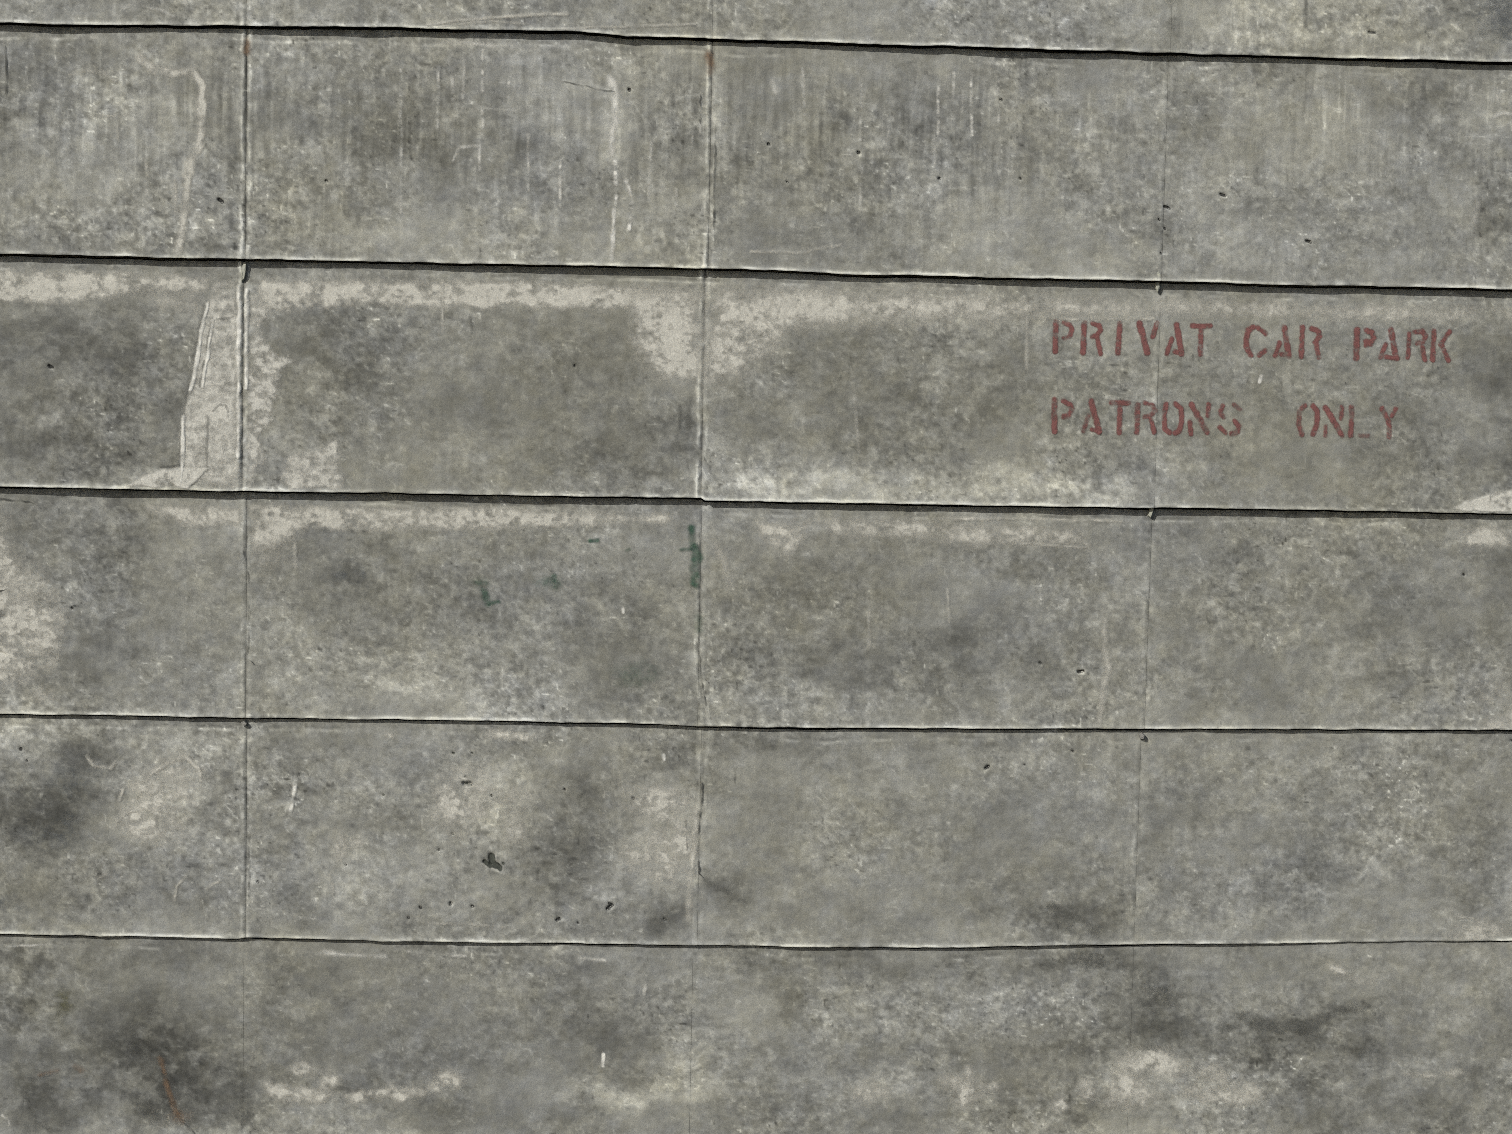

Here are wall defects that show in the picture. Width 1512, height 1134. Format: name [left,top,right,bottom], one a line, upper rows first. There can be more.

leakage [136,54,207,255]
leakage [607,75,631,260]
leakage [0,269,214,392]
peeling [185,391,237,487]
leakage [236,279,1466,459]